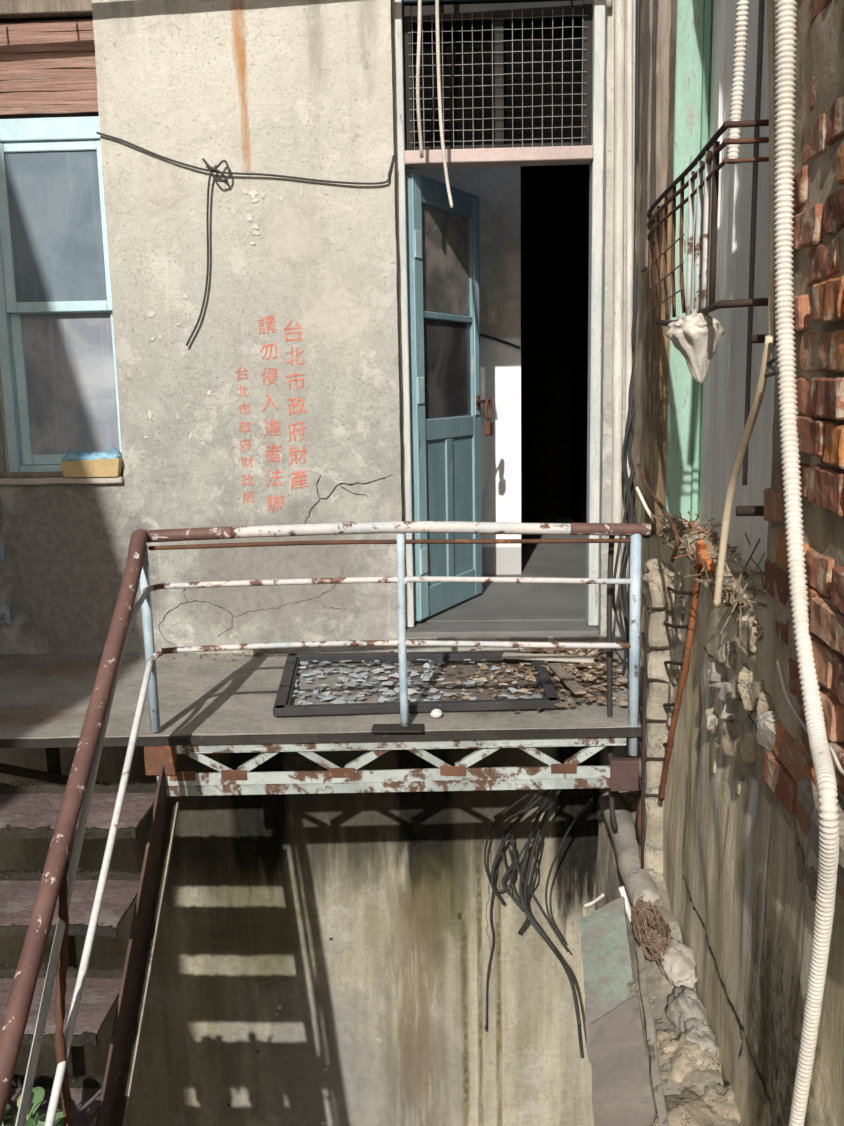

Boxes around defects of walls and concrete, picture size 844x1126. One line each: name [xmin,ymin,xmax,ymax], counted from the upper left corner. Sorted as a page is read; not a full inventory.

corrosion [235,5,248,156]
crack [305,475,391,522]
damp [140,746,157,784]
damp [177,747,517,773]
damp [556,746,602,766]
damp [683,657,725,875]
damp [163,790,517,1126]
damp [555,788,601,922]
damp [740,776,771,1024]